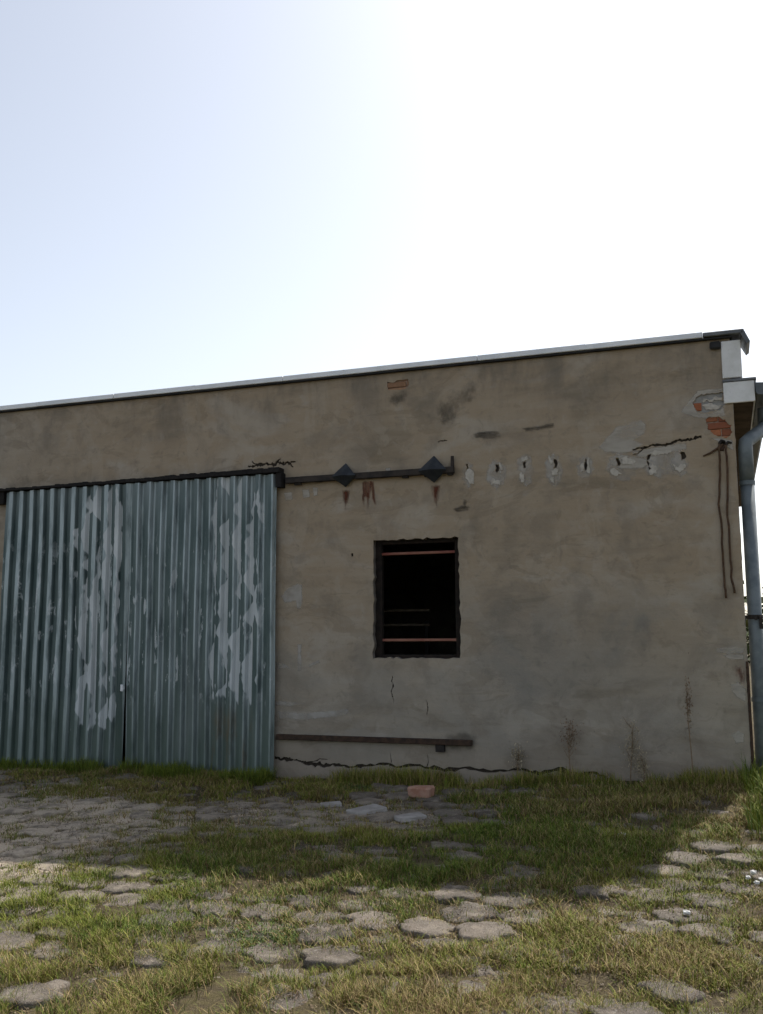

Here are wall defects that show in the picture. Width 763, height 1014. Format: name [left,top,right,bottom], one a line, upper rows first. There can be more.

spalling [682,389,733,451]
flaking render [600,422,686,476]
crack [634,436,702,454]
crack [249,459,295,468]
crack [275,757,606,777]